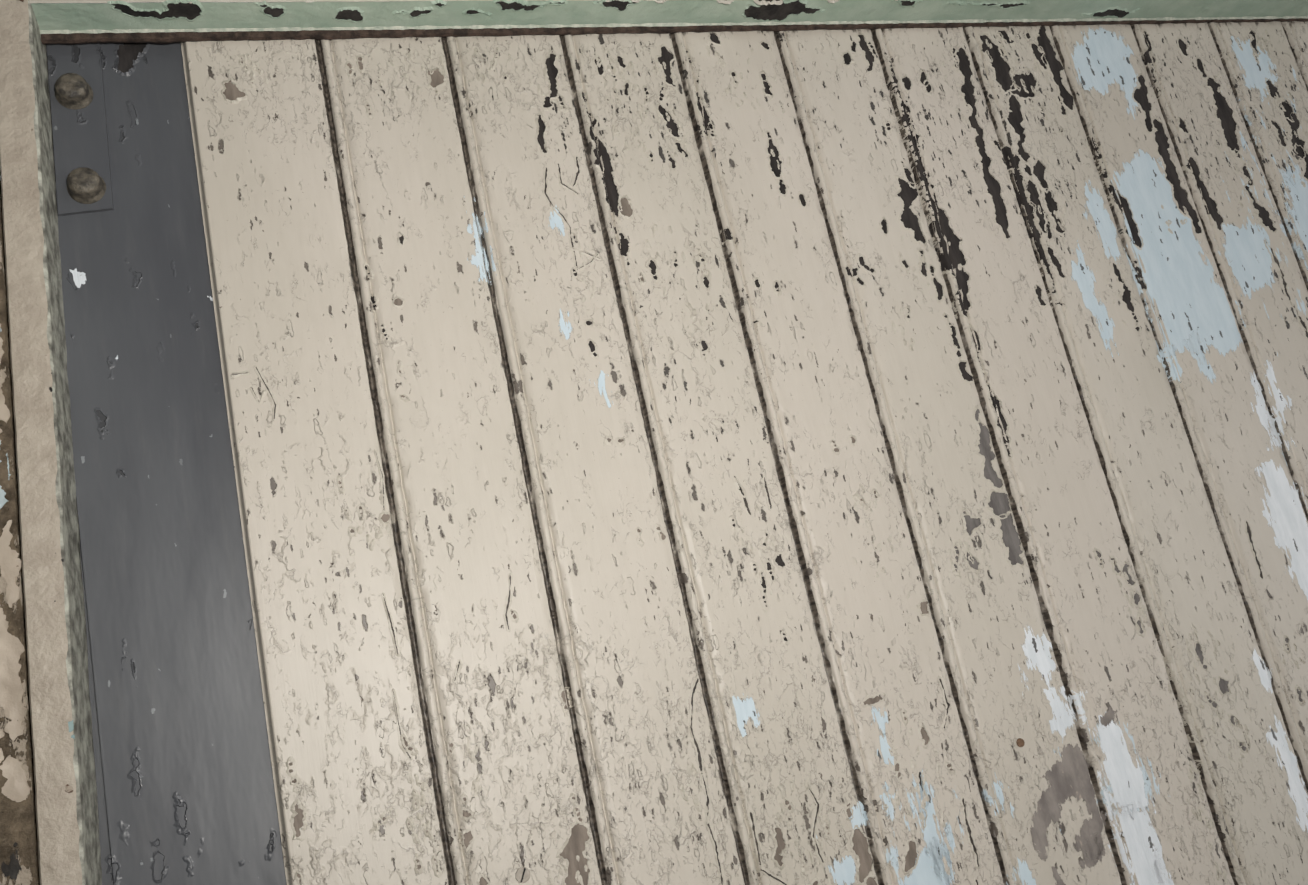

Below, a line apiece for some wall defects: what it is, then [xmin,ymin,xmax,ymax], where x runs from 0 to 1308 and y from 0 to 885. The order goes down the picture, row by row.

peeling [107,0,204,22]
peeling [332,7,365,23]
peeling [462,0,567,16]
peeling [742,0,826,22]
peeling [535,32,785,360]
peeling [759,127,807,208]
peeling [840,6,1308,601]
peeling [0,324,30,802]
peeling [771,773,878,885]
peeling [861,692,956,885]
peeling [1018,623,1174,885]
peeling [1266,715,1308,832]